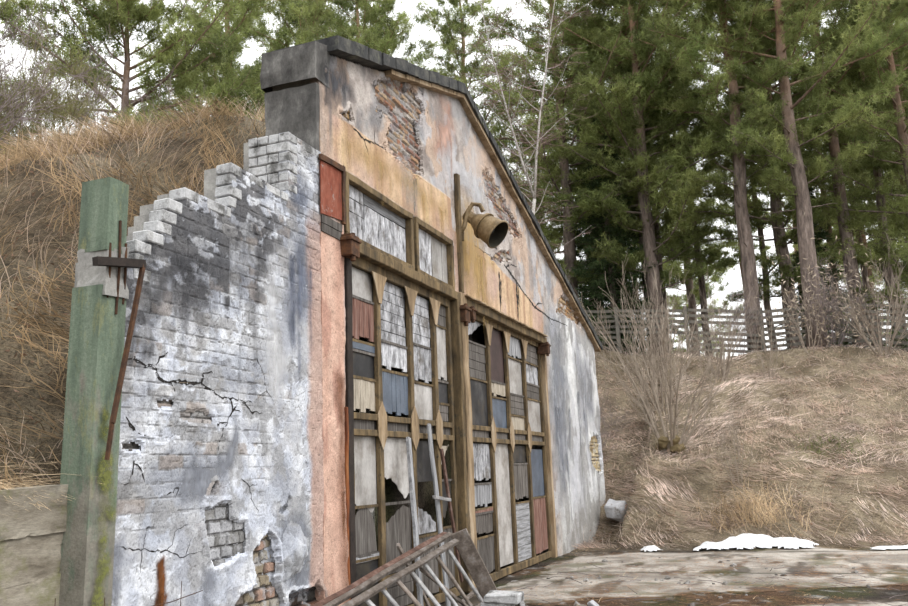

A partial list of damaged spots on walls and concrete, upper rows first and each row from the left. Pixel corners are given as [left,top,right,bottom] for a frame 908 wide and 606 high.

spalling [371,75,428,180]
spalling [481,163,524,267]
crack [128,352,277,451]
spalling [589,431,603,478]
crack [120,522,200,569]
corrosion [157,557,168,606]
spalling [200,490,294,606]